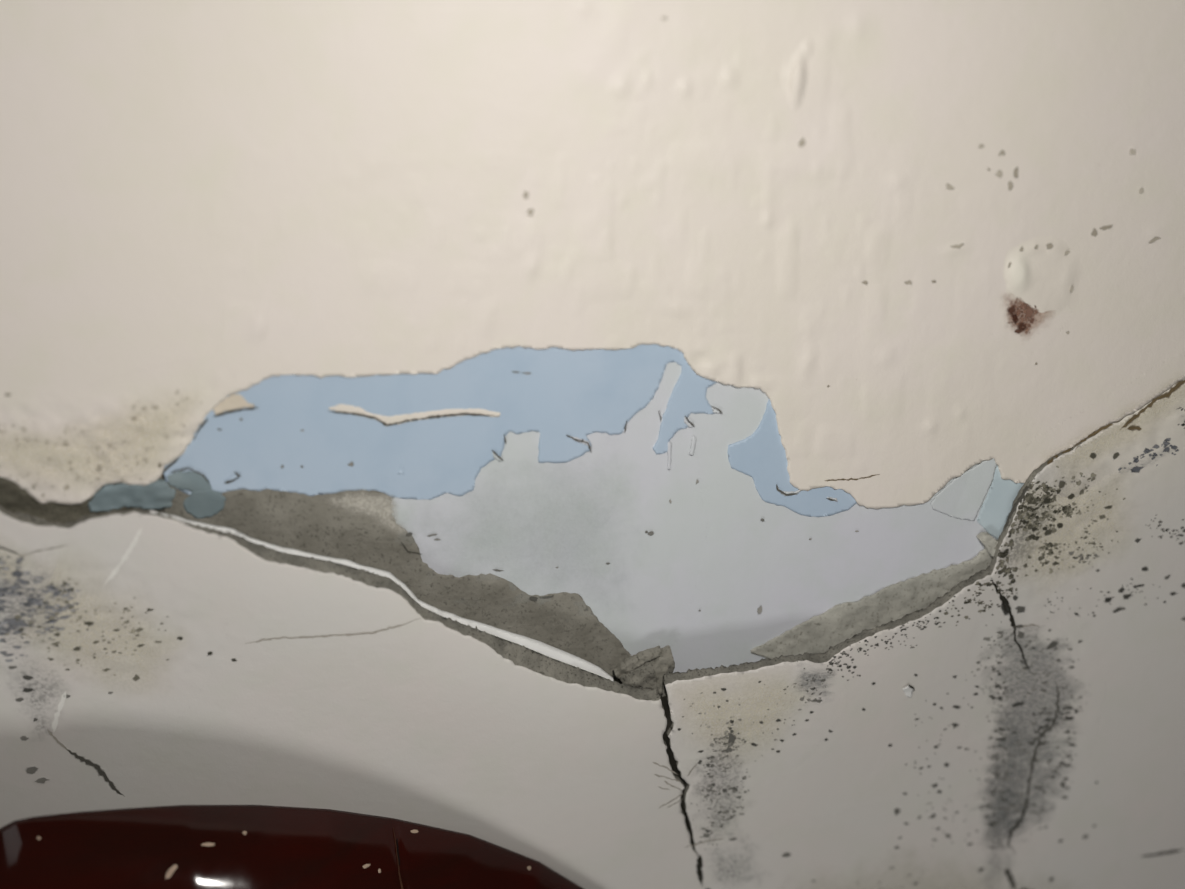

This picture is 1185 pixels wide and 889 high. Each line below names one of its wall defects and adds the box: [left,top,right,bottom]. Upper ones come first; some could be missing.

rust [1008,300,1041,334]
crack [1047,380,1185,465]
mould [1113,438,1179,472]
crack [0,477,176,556]
peeling [0,344,1024,684]
crack [1005,486,1028,529]
leakage [0,556,183,702]
crack [245,618,421,644]
mould [678,466,1185,850]
crack [991,578,1060,889]
crack [652,696,726,889]
crack [1141,849,1182,857]